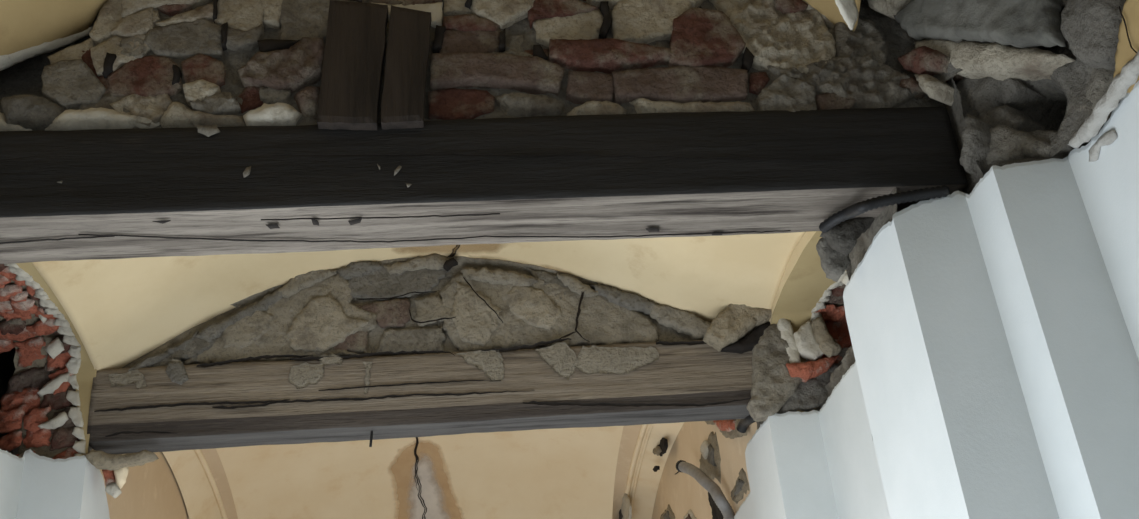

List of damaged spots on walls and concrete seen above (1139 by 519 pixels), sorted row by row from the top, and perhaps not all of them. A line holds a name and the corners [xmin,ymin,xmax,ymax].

peeling [0,27,93,71]
spalling [804,0,1139,195]
spalling [0,263,159,499]
spalling [128,254,449,371]
crack [196,347,455,368]
crack [356,245,590,353]
spalling [556,273,711,341]
crack [656,339,706,347]
spalling [777,271,852,382]
crack [414,437,427,519]
spalling [653,438,668,472]
spalling [699,419,750,519]